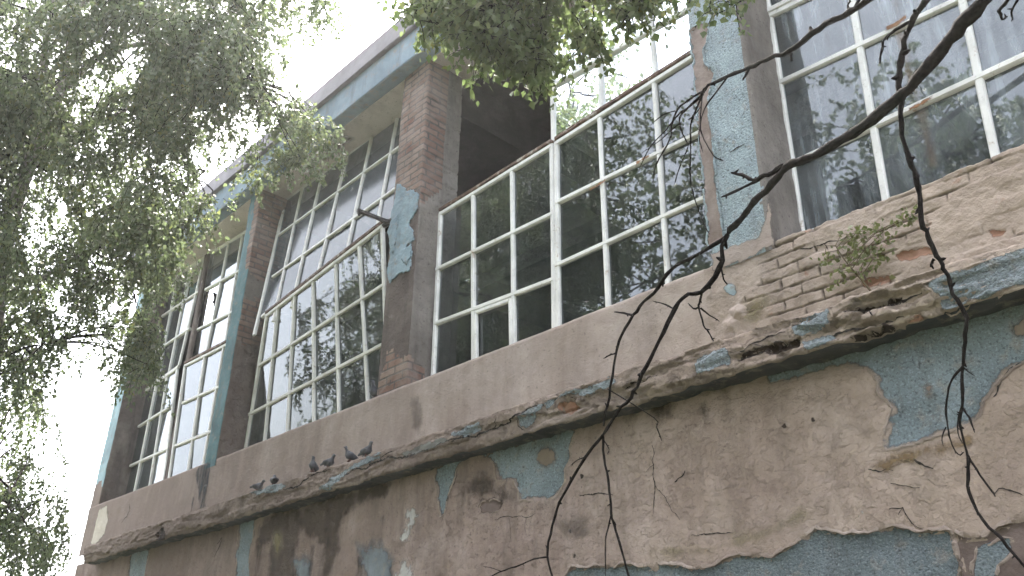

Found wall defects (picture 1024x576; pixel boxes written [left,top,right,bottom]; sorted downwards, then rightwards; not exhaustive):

spalling [688,24,724,246]
peeling [386,184,419,283]
flaking render [767,246,1024,452]
peeling [517,376,617,428]
water stain [257,483,388,576]
peeling [358,543,392,576]
flaking render [484,429,575,503]
flaking render [562,517,1024,576]
crack [868,459,933,529]